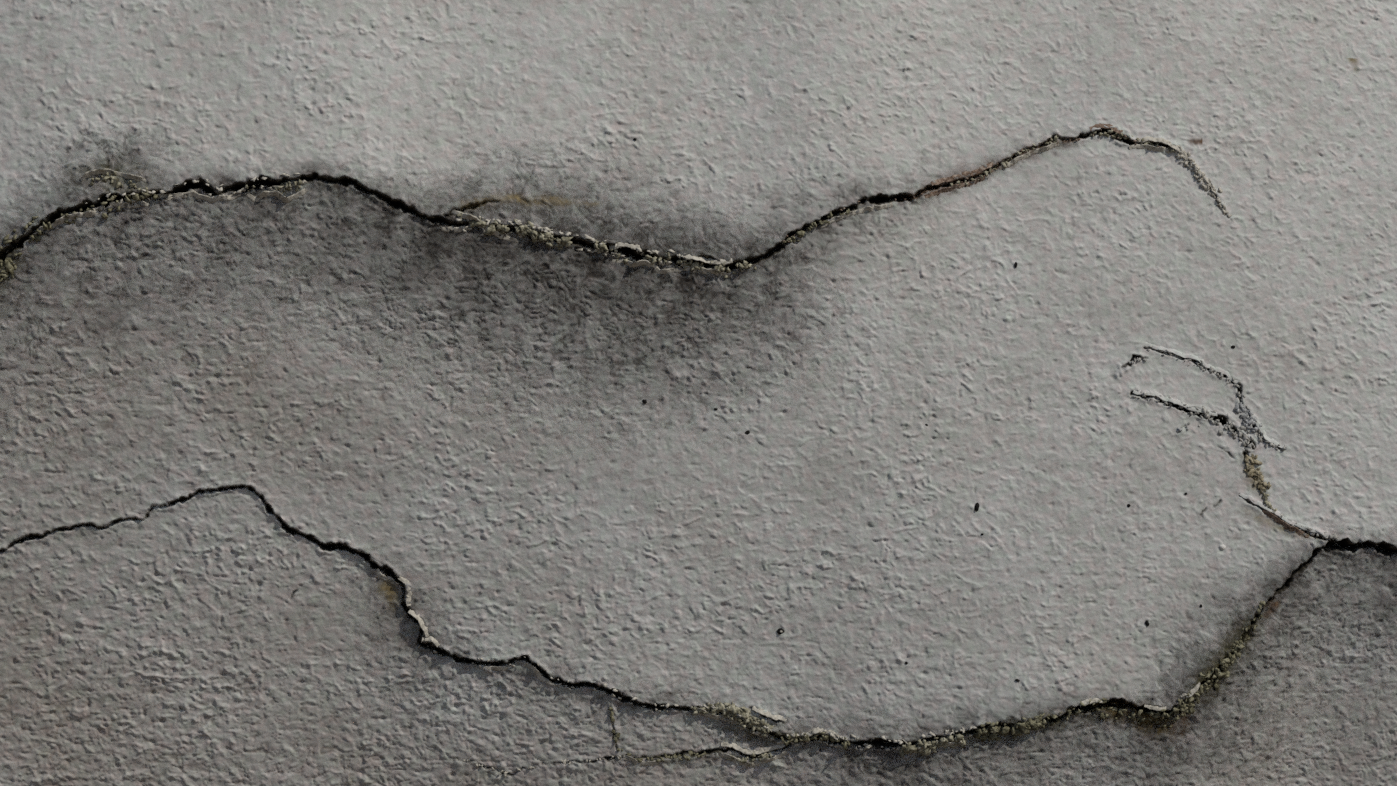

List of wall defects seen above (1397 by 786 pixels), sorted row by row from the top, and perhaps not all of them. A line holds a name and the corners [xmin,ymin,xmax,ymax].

crack [0,123,1232,282]
crack [0,342,1397,777]